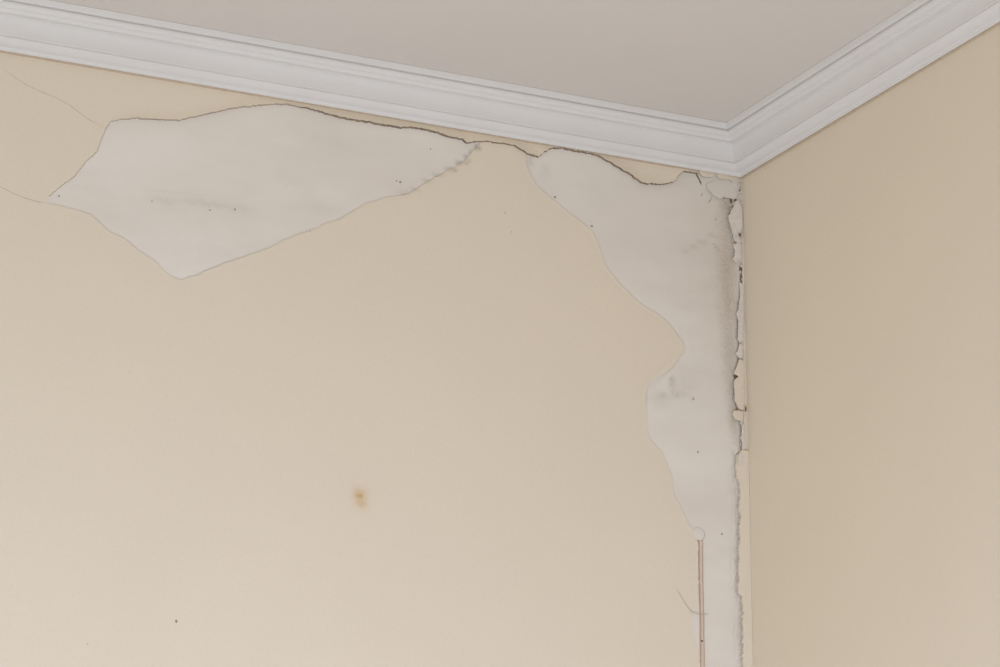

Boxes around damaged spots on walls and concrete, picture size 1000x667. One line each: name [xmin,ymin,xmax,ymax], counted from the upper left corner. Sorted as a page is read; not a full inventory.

peeling [46,92,753,667]
damp [646,173,743,456]